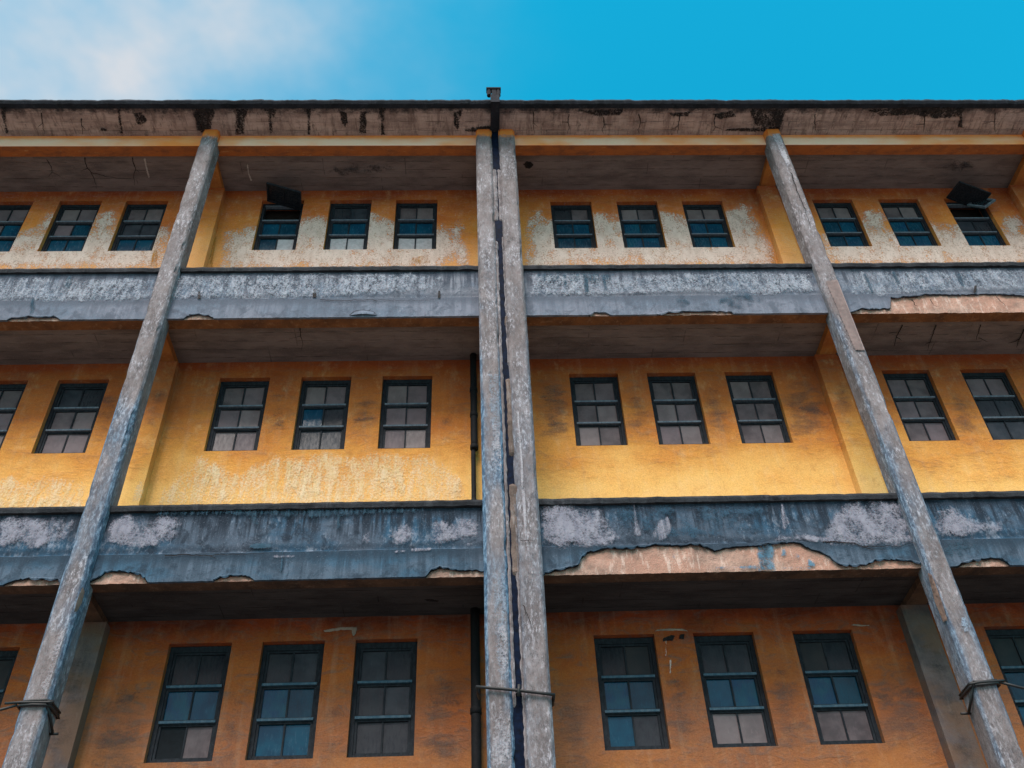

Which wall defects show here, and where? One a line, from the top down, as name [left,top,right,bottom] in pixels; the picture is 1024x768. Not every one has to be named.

leakage [192,108,215,132]
leakage [233,109,248,135]
leakage [339,107,386,135]
peeling [822,209,1024,350]
peeling [517,412,529,550]
spalling [74,569,148,612]
spalling [213,574,254,582]
spalling [531,502,947,622]